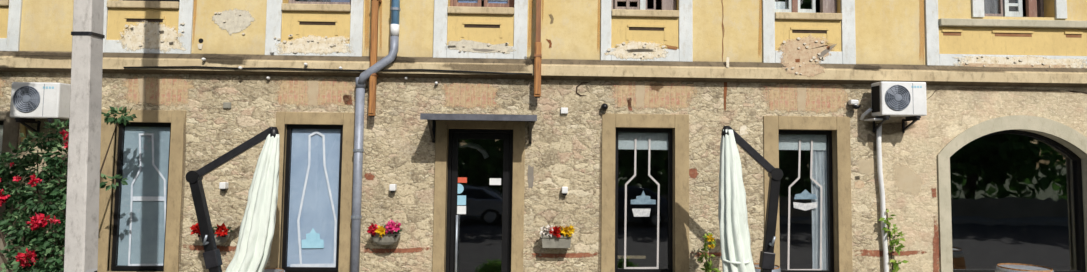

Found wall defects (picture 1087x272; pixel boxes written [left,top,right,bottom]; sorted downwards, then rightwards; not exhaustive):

peeling [212,8,254,35]
peeling [117,21,203,53]
peeling [270,34,351,55]
peeling [605,41,678,60]
flaking render [763,33,848,115]